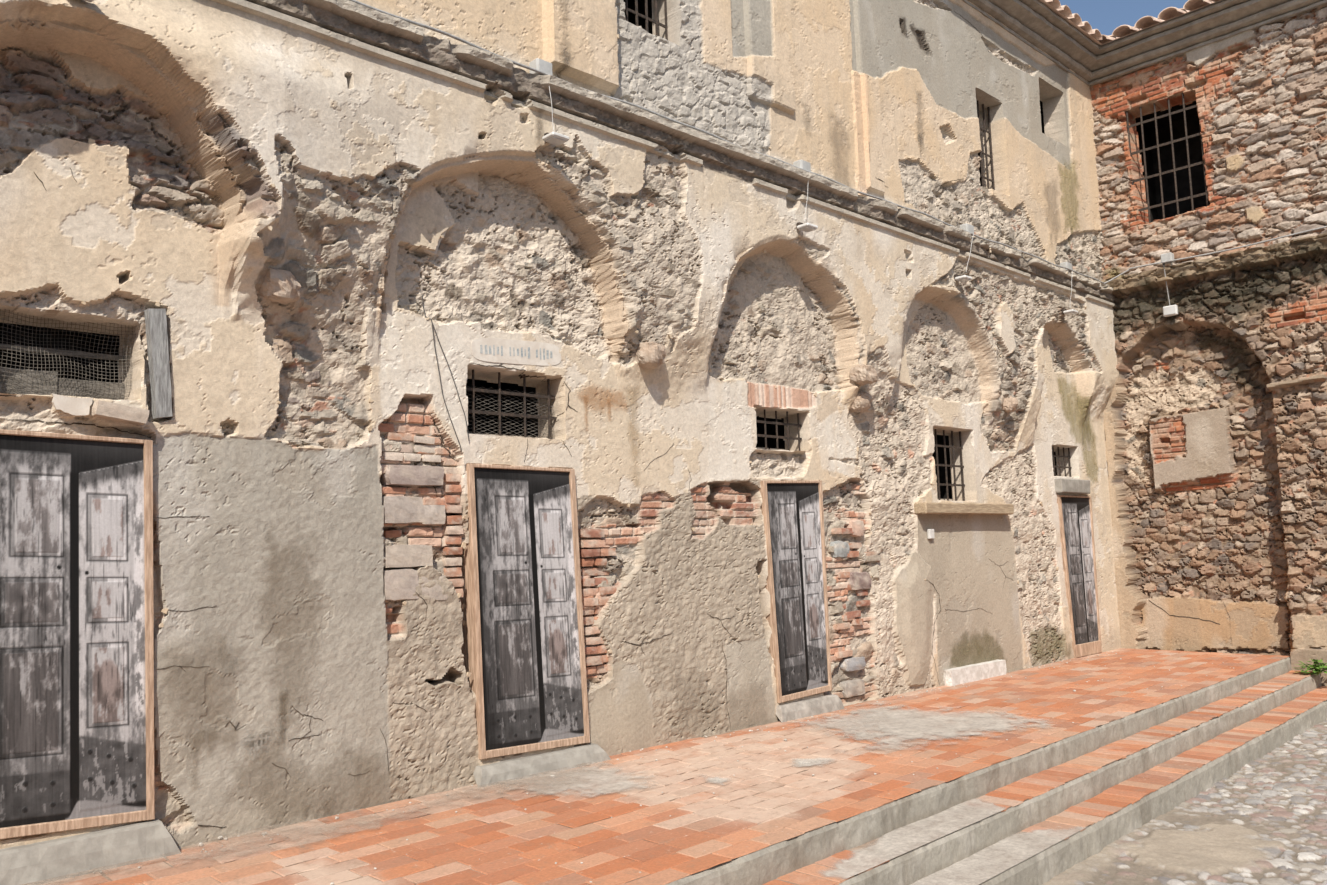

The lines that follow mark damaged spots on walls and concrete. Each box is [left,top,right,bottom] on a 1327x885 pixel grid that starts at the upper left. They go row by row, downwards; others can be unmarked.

spalling [0,12,704,639]
flaking render [577,449,813,691]
spalling [708,158,1109,704]
crack [931,574,1044,681]